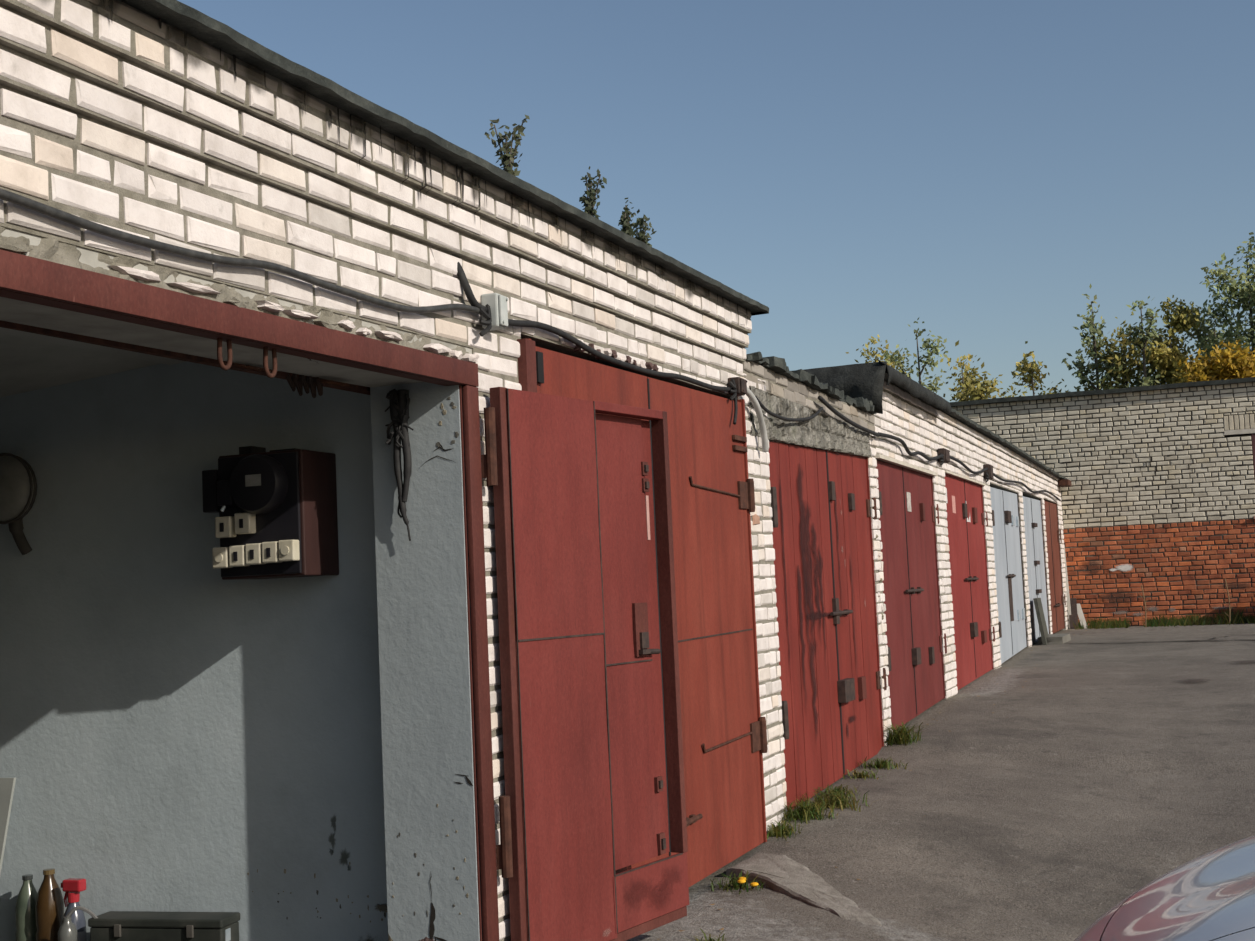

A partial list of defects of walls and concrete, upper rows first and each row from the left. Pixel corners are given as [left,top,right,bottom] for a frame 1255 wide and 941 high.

peeling [329,816,351,870]
peeling [336,882,394,941]